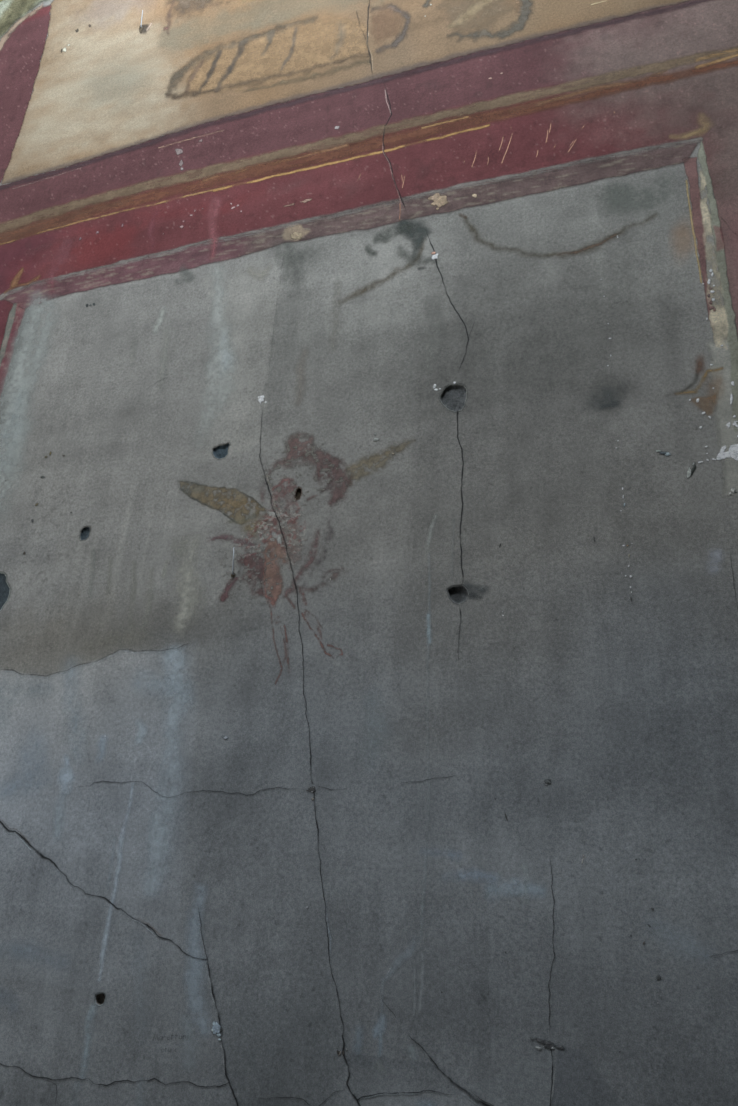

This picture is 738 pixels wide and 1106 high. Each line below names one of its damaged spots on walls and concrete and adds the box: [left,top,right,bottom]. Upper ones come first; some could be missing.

crack [259,411,490,1106]
crack [0,821,238,1106]
crack [547,869,555,1105]